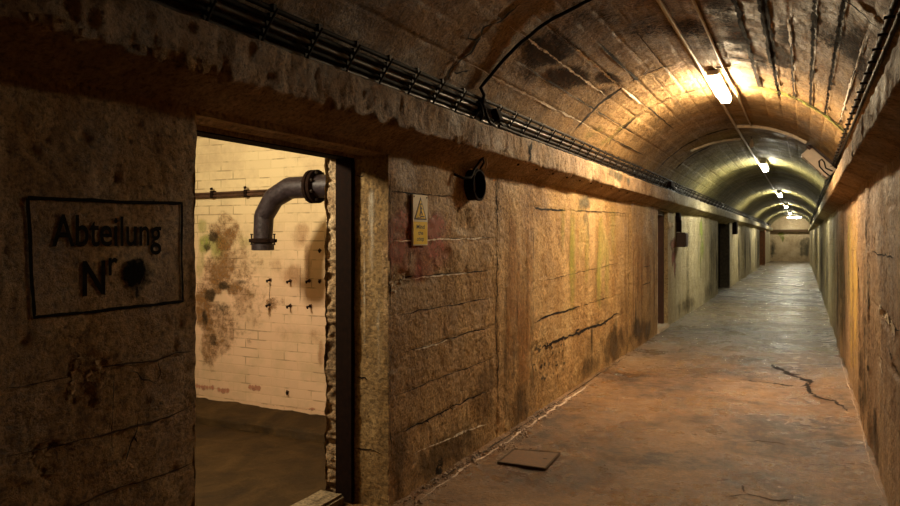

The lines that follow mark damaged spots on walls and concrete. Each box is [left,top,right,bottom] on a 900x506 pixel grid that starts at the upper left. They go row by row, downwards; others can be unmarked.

crack [0,351,192,462]
damp [195,218,254,364]
crack [533,202,651,390]
crack [749,193,900,491]
crack [77,464,189,506]